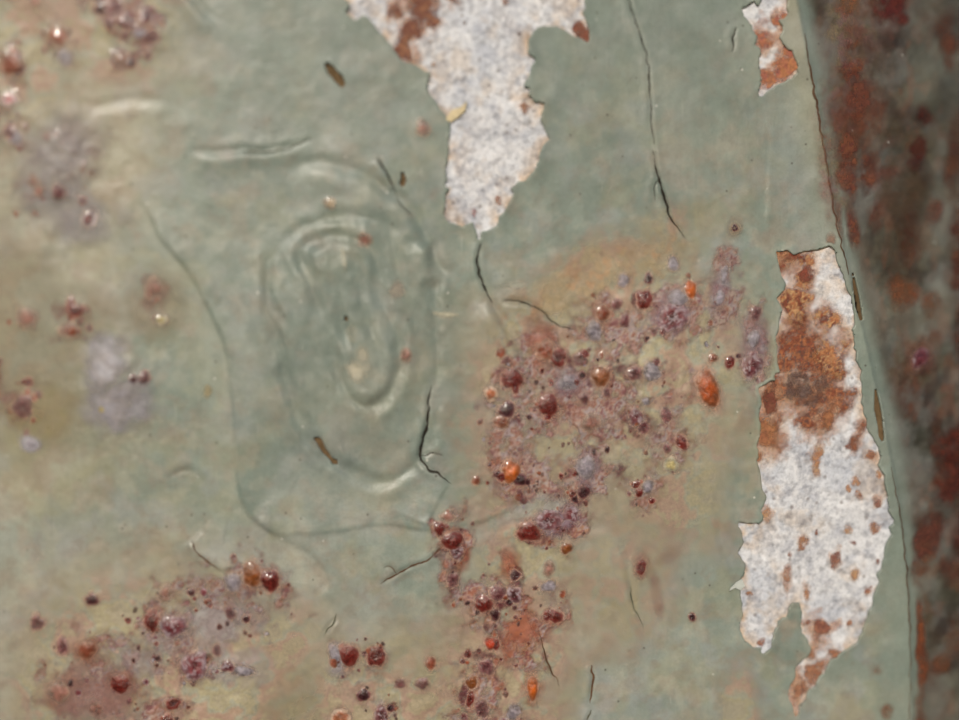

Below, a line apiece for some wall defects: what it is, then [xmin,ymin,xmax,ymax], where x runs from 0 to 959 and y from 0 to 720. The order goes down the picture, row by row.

corrosion [0,0,166,151]
peeling [325,63,345,88]
peeling [346,0,589,239]
crack [629,1,685,238]
peeling [742,0,798,96]
crack [805,36,849,274]
corrosion [0,256,93,450]
corrosion [18,241,771,720]
crack [382,546,443,583]
crack [419,389,451,484]
peeling [729,246,894,716]
corrosion [916,603,959,685]